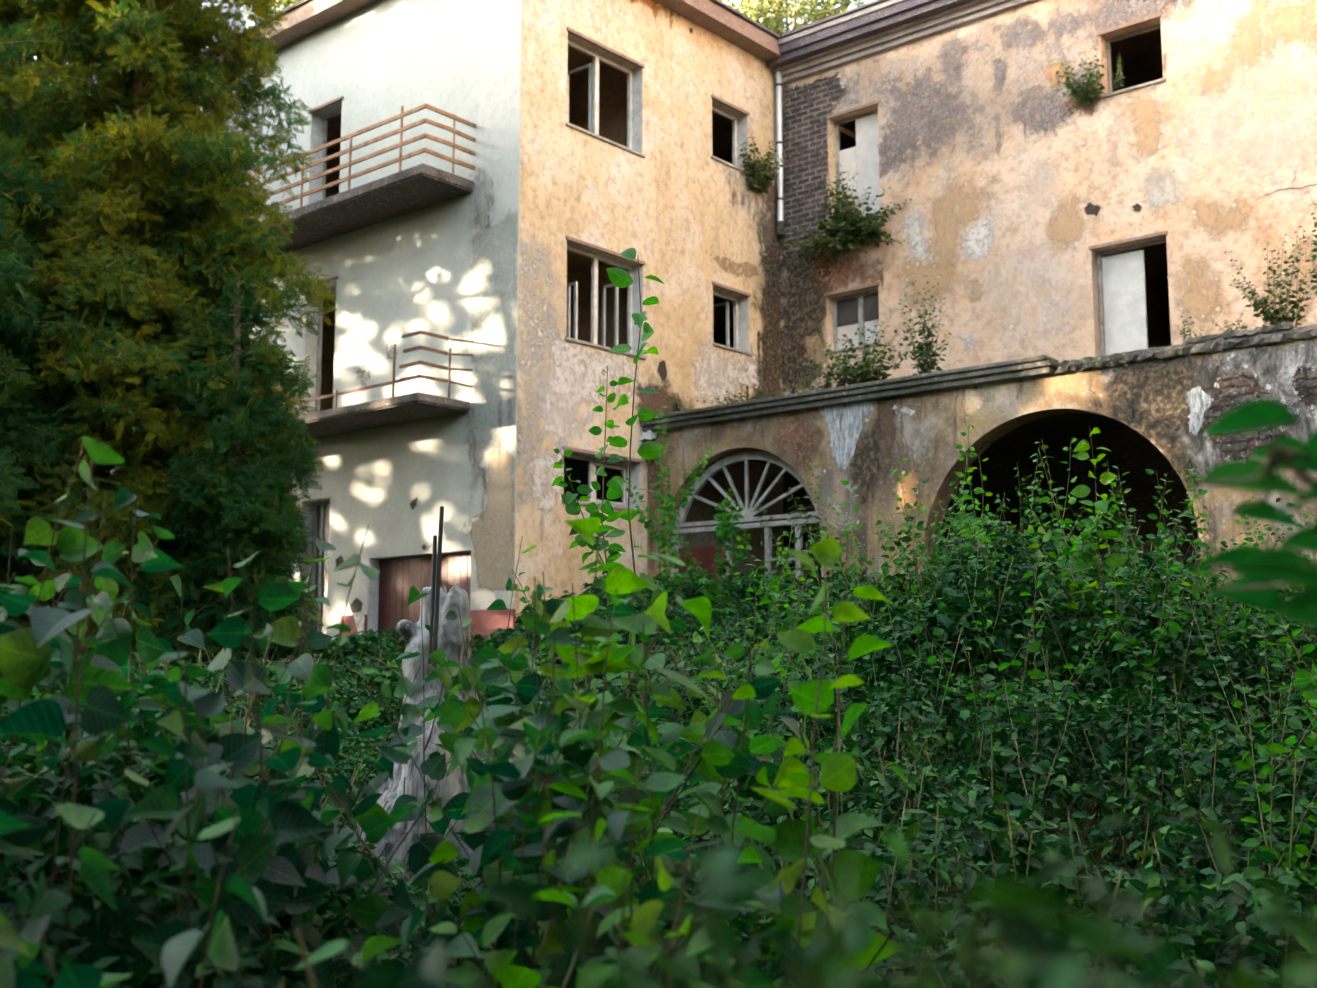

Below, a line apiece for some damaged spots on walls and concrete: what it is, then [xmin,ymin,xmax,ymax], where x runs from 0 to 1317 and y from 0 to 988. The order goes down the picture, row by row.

leakage [835,0,1191,185]
crack [1251,173,1317,204]
peeling [1259,238,1317,321]
flaking render [818,400,874,473]
flaking render [1093,339,1317,485]